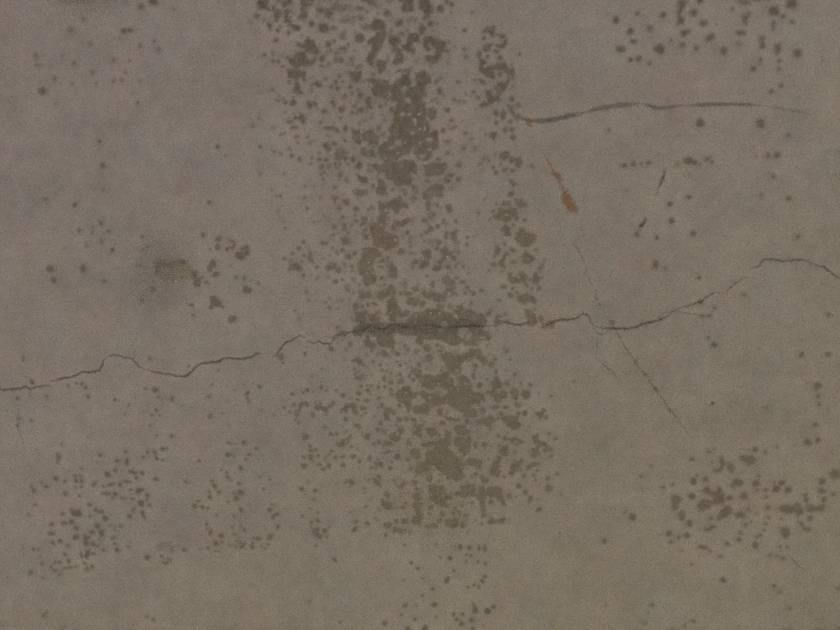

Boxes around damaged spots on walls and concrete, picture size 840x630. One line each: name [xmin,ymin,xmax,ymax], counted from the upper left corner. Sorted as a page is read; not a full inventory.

damp [609,0,806,97]
damp [179,230,276,325]
damp [219,0,565,549]
damp [25,385,176,582]
damp [180,439,283,554]
damp [660,443,840,568]
damp [398,542,489,630]